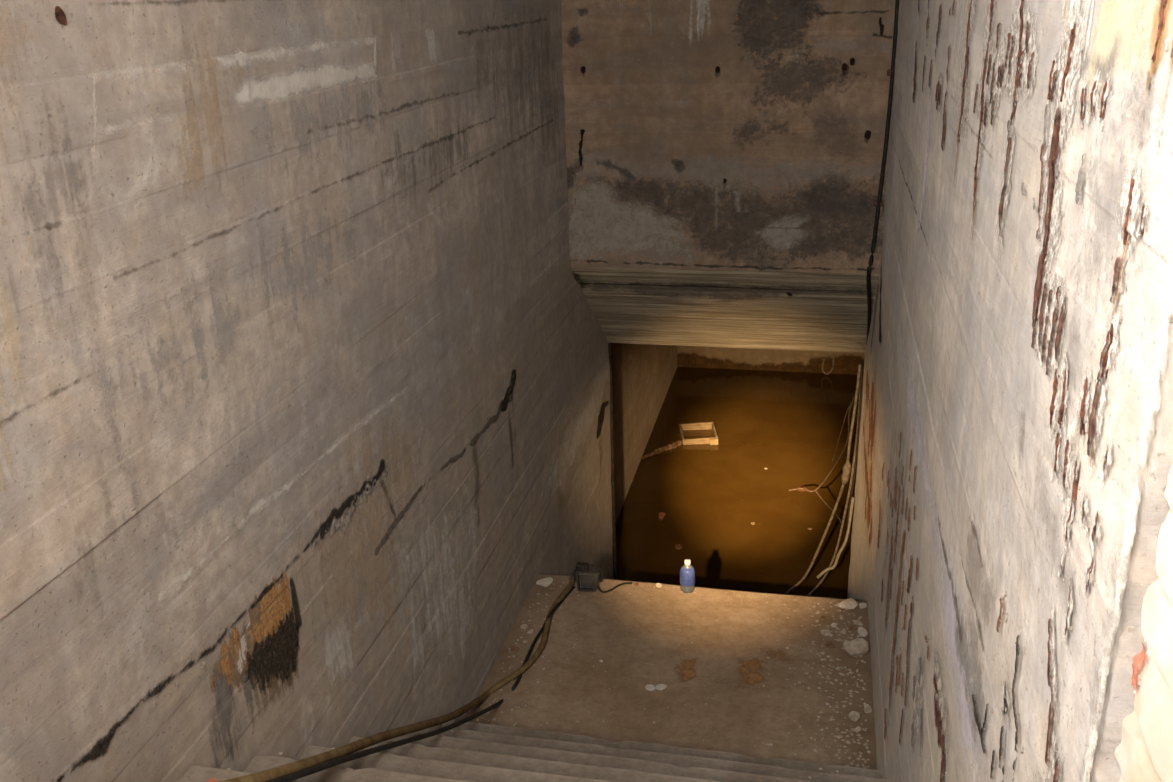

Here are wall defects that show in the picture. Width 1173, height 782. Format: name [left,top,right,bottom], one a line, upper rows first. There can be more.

damp [737,0,823,63]
damp [567,160,884,288]
corrosion [863,371,876,547]
spalling [1109,246,1173,694]
crack [56,369,516,782]
corrosion [884,537,916,744]
spalling [1083,657,1108,782]